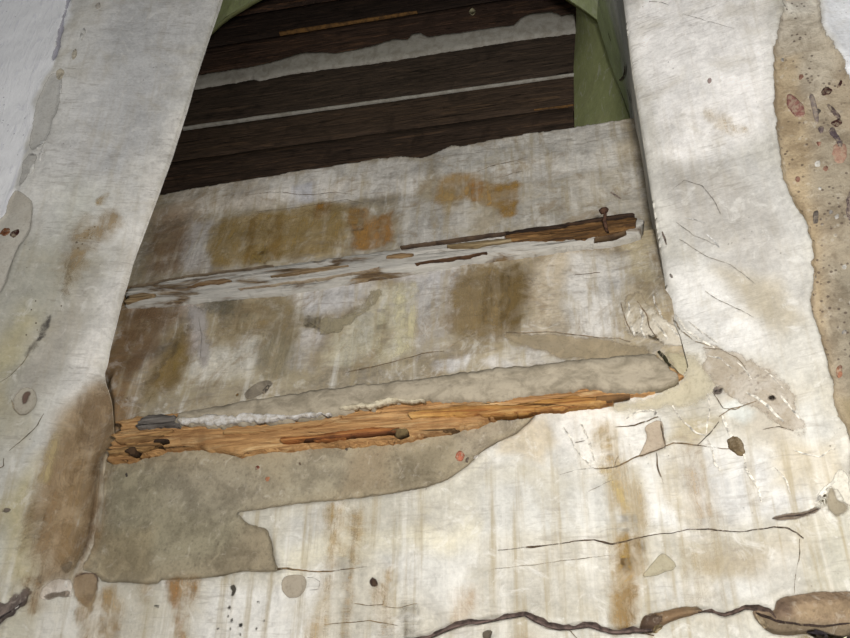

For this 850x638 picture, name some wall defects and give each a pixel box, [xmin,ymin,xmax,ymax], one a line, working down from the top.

spalling [0,68,64,292]
corrosion [213,204,391,262]
spalling [773,0,850,439]
water stain [451,265,526,331]
crack [504,331,688,375]
flaking render [614,293,805,471]
water stain [33,388,114,565]
spalling [0,417,534,624]
crack [560,401,756,491]
crack [496,507,821,593]
crack [415,611,654,638]
crack [698,605,776,618]